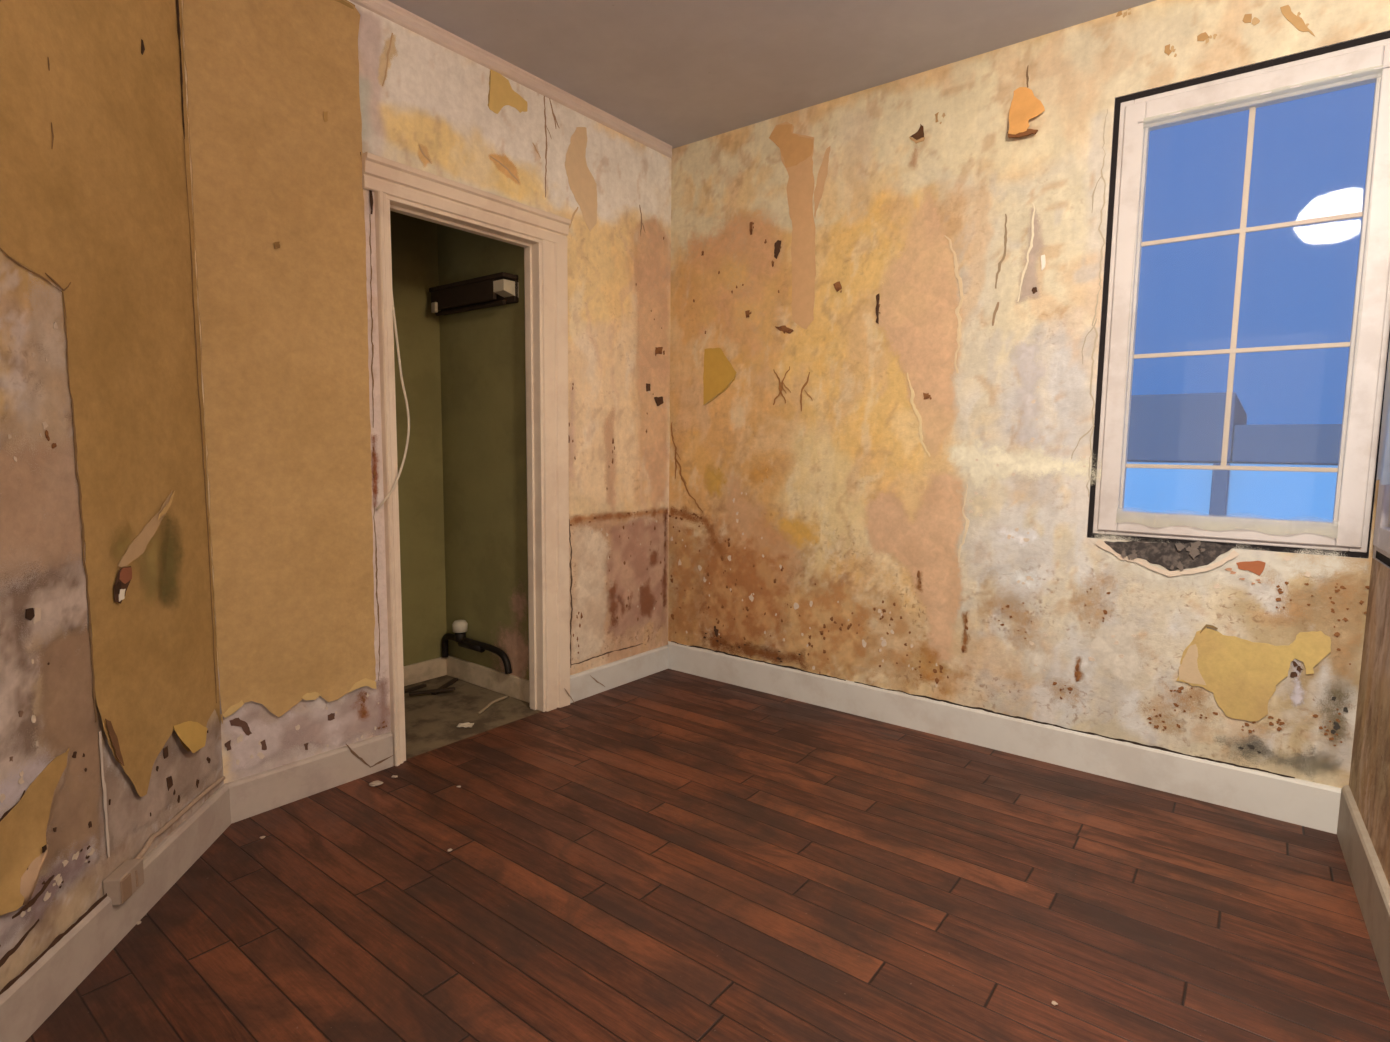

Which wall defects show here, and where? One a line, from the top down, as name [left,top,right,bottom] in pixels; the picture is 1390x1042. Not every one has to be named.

peeling [1007,87,1045,138]
flaking render [1095,540,1266,585]
water stain [1214,678,1356,779]